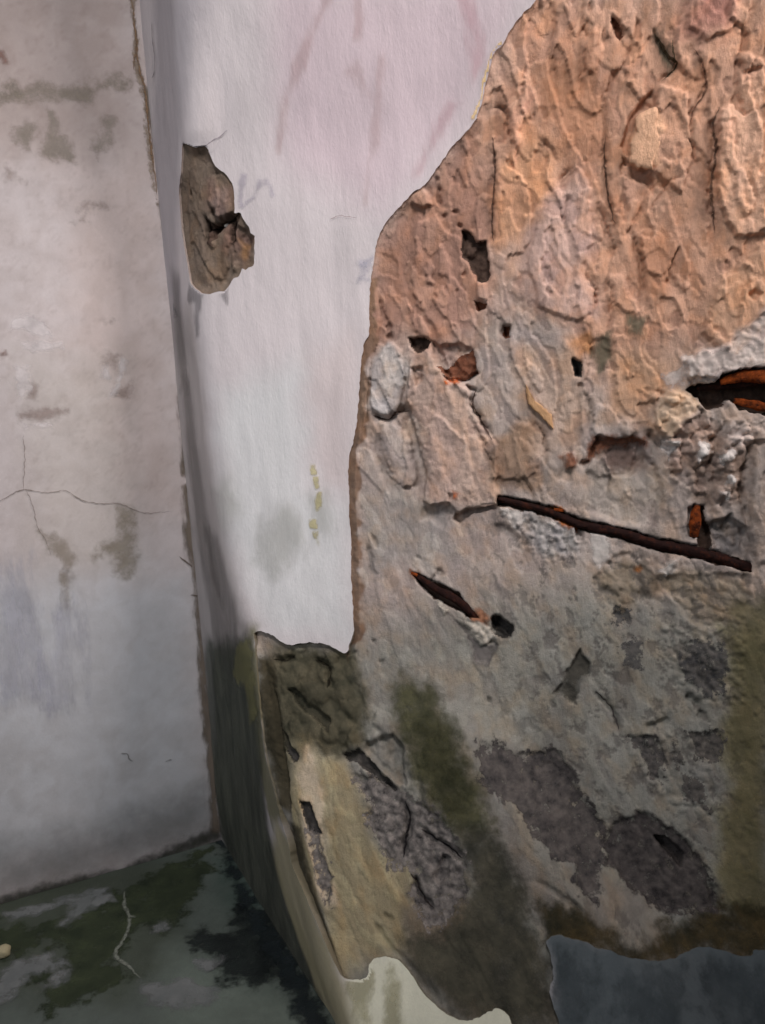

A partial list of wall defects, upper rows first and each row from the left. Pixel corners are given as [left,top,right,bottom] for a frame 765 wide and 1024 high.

spalling [181,144,255,294]
rust [719,369,765,385]
rust [733,398,765,412]
crack [0,436,170,551]
leakage [180,451,196,581]
spalling [257,0,765,1024]
leakage [0,875,99,904]
leakage [129,596,334,1024]
crack [403,801,462,908]
leakage [351,725,592,1024]